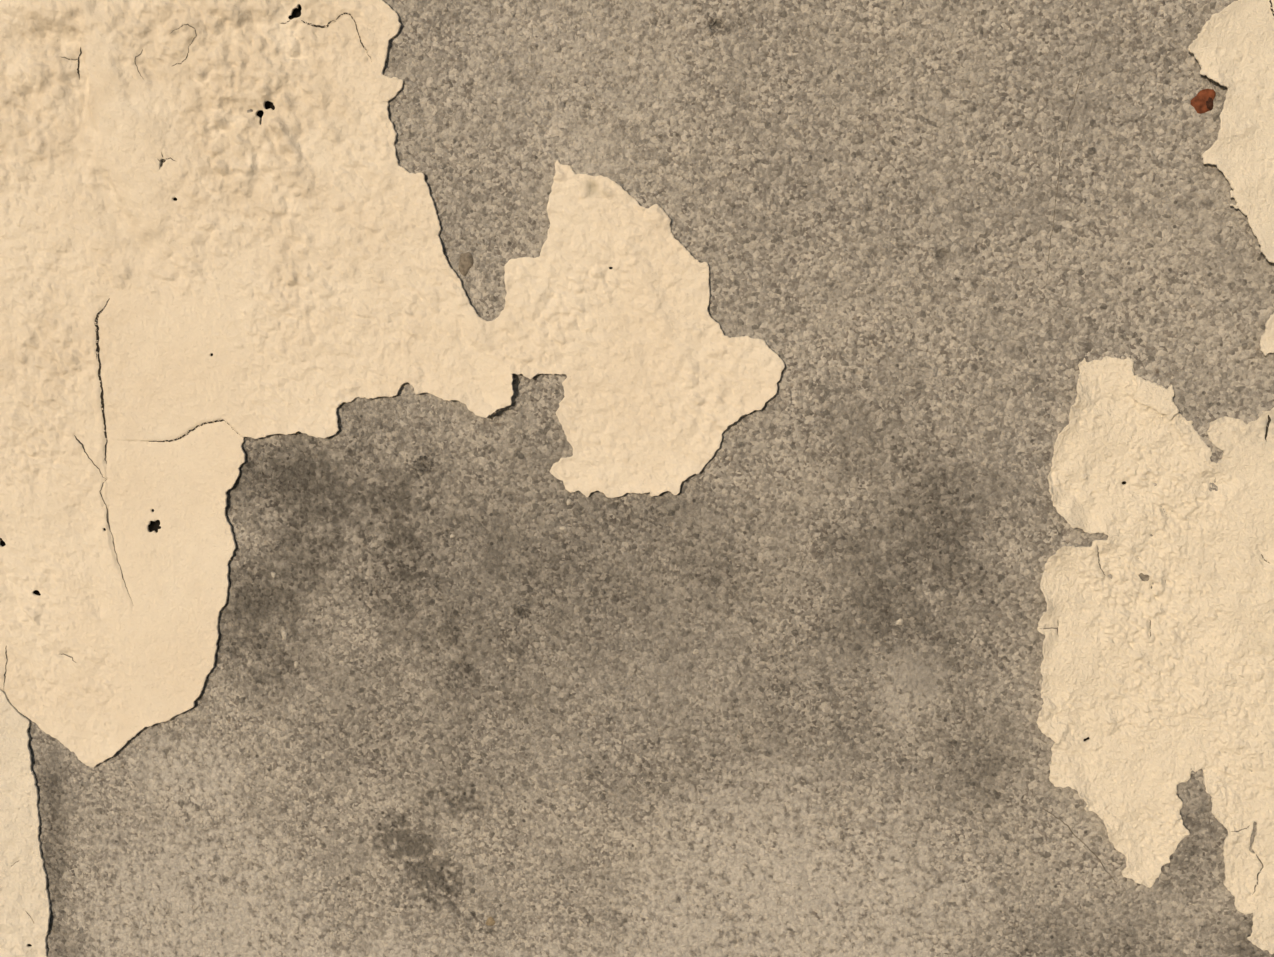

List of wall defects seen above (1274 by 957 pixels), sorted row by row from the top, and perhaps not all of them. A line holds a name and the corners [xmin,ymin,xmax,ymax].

crack [74,298,133,604]
crack [149,419,238,442]
peeling [0,0,785,957]
spalling [930,246,954,265]
rust [1190,89,1216,114]
peeling [1188,0,1274,263]
peeling [1259,313,1274,356]
peeling [1036,356,1274,954]